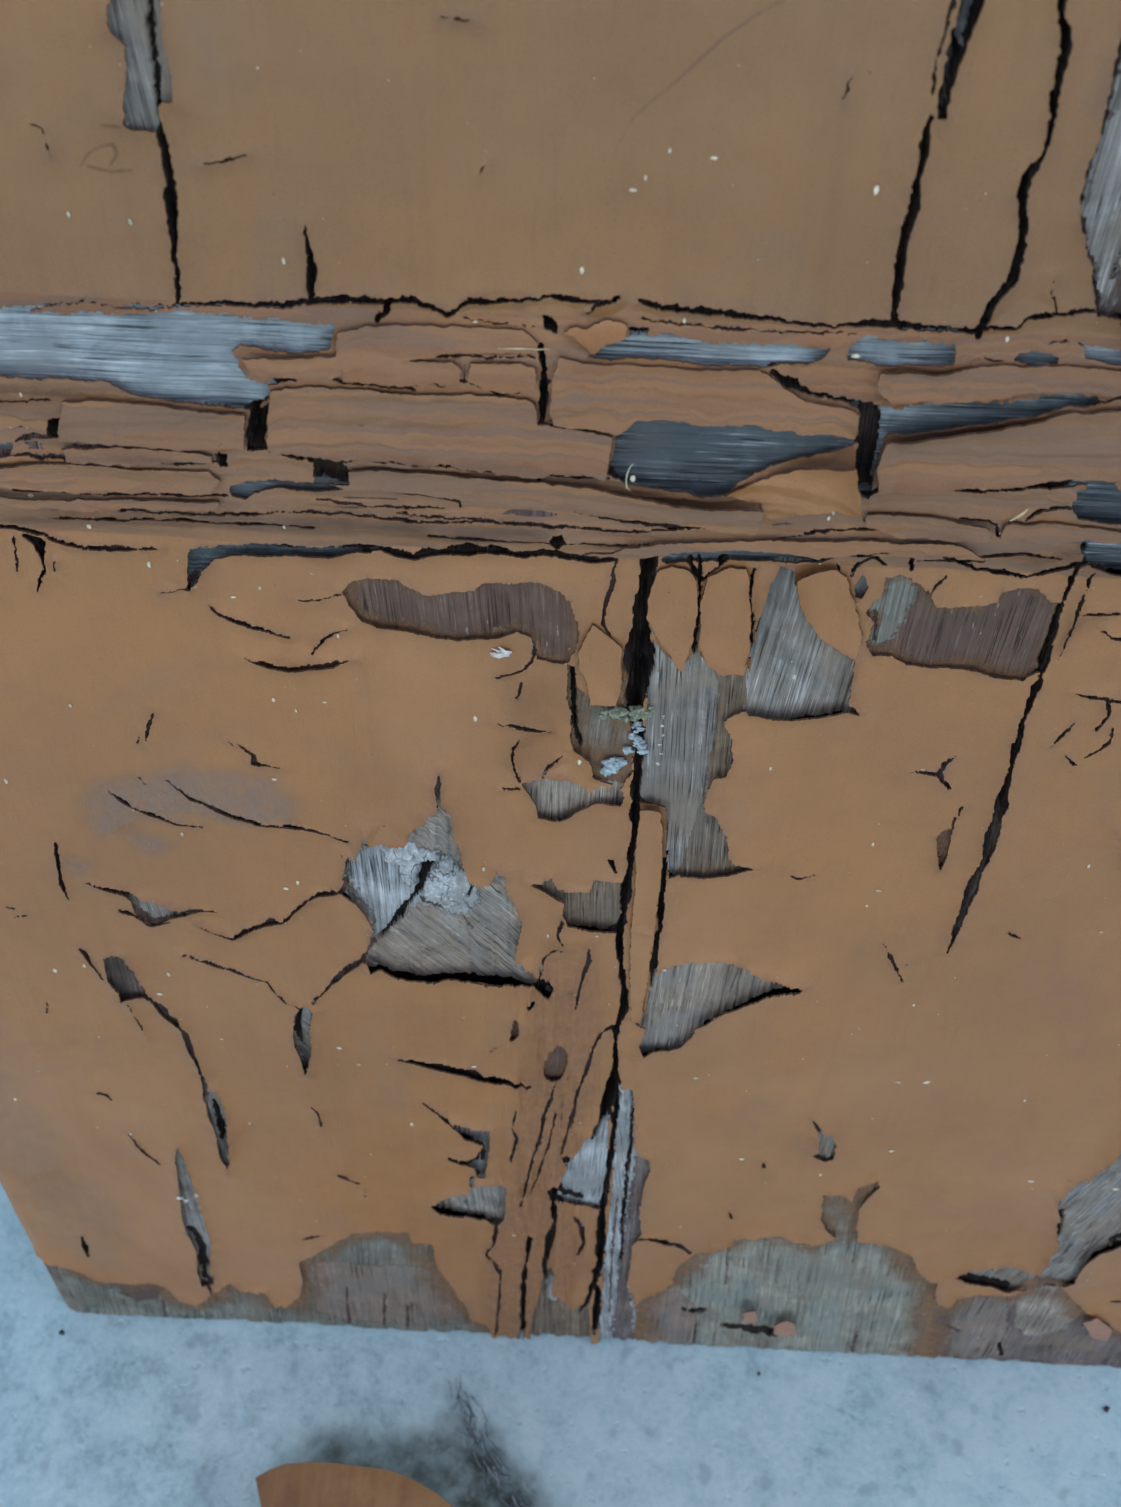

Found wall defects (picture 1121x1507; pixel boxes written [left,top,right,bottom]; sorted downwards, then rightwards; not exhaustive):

peeling [107,0,173,131]
crack [136,0,1121,431]
peeling [1080,55,1121,316]
crack [0,378,1121,952]
peeling [0,299,1121,1072]
peeling [79,948,230,1168]
peeling [44,1045,568,1334]
peeling [530,1085,1121,1368]